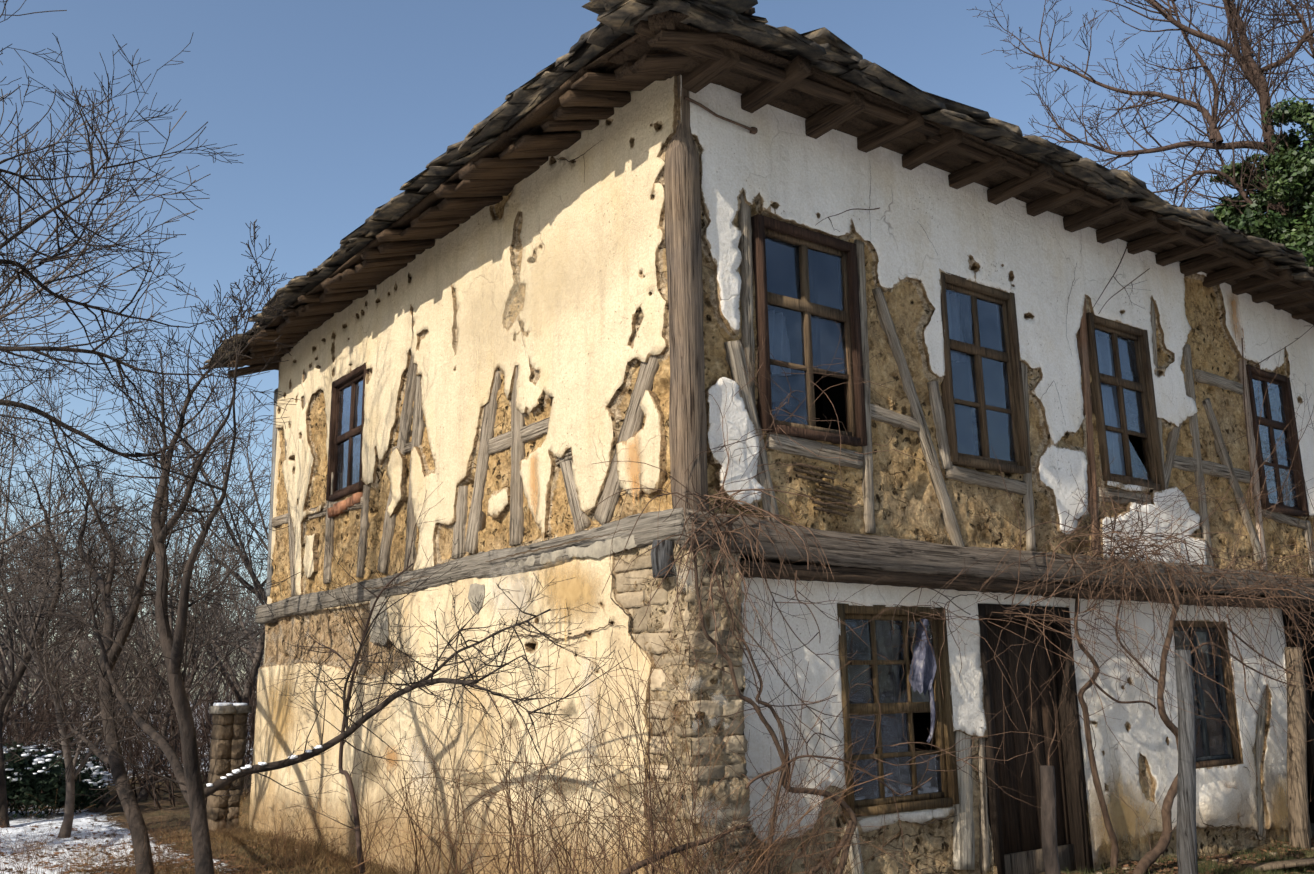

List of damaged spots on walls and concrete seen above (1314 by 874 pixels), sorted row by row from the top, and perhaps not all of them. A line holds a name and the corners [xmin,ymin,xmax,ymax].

spalling [493,191,536,329]
spalling [435,212,673,564]
spalling [700,195,1314,579]
spalling [269,370,435,603]
spalling [262,604,412,679]
spalling [749,736,994,874]
spalling [1139,756,1152,800]